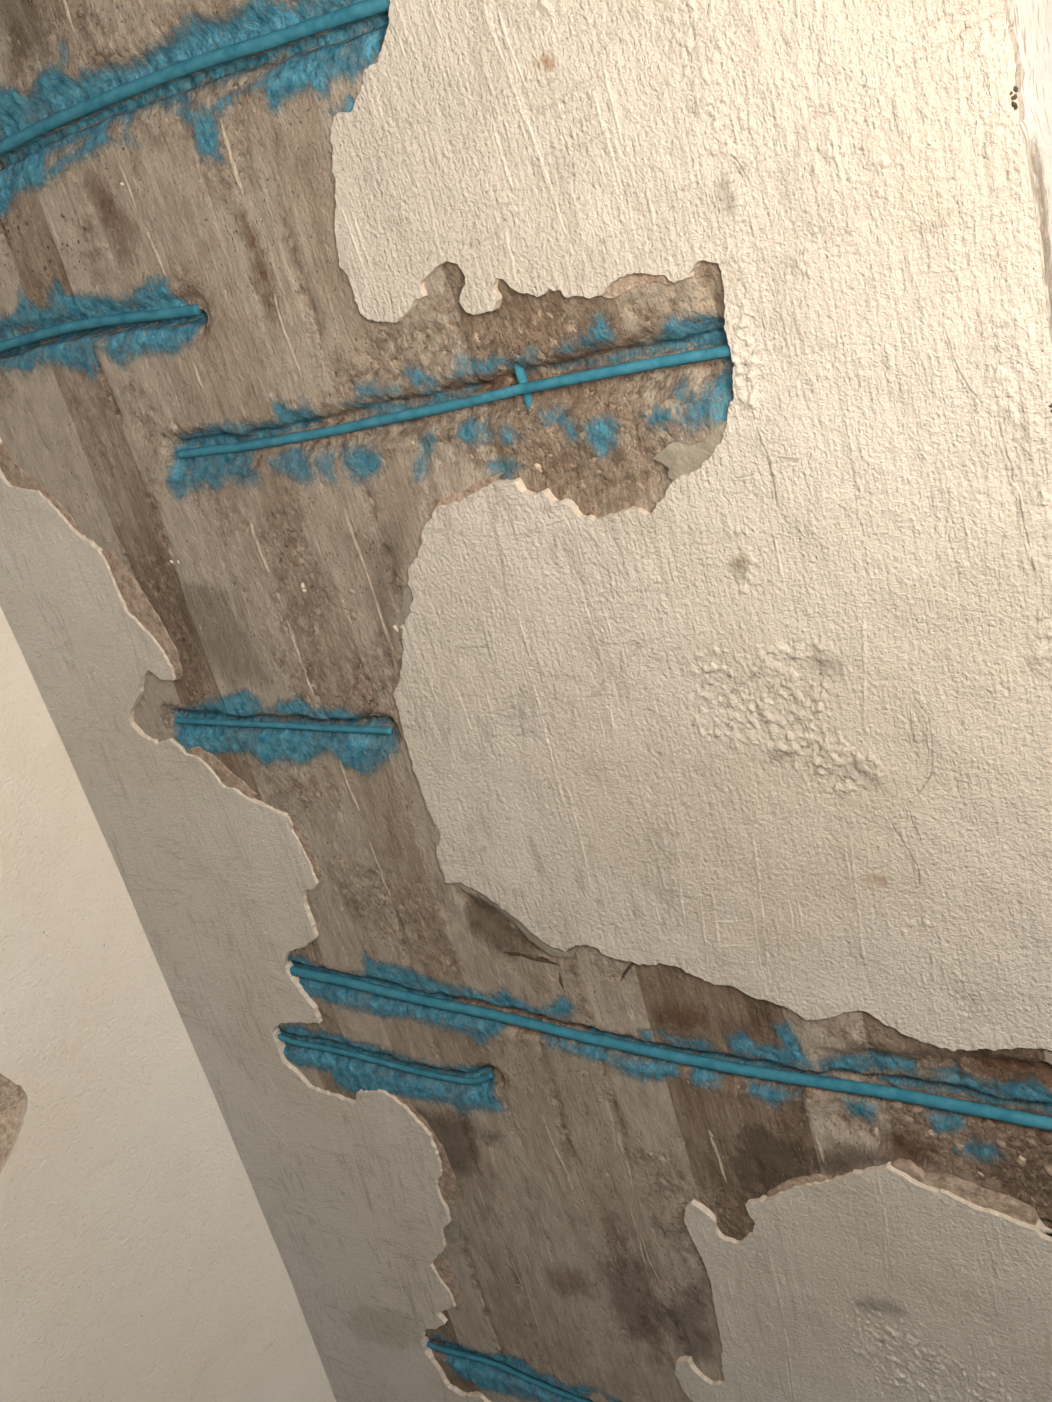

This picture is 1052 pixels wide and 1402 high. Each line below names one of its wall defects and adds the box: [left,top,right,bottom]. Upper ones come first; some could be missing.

spalling [44,109,107,137]
spalling [0,0,323,111]
spalling [1004,18,1025,124]
spalling [0,1074,24,1166]
spalling [277,993,1052,1402]